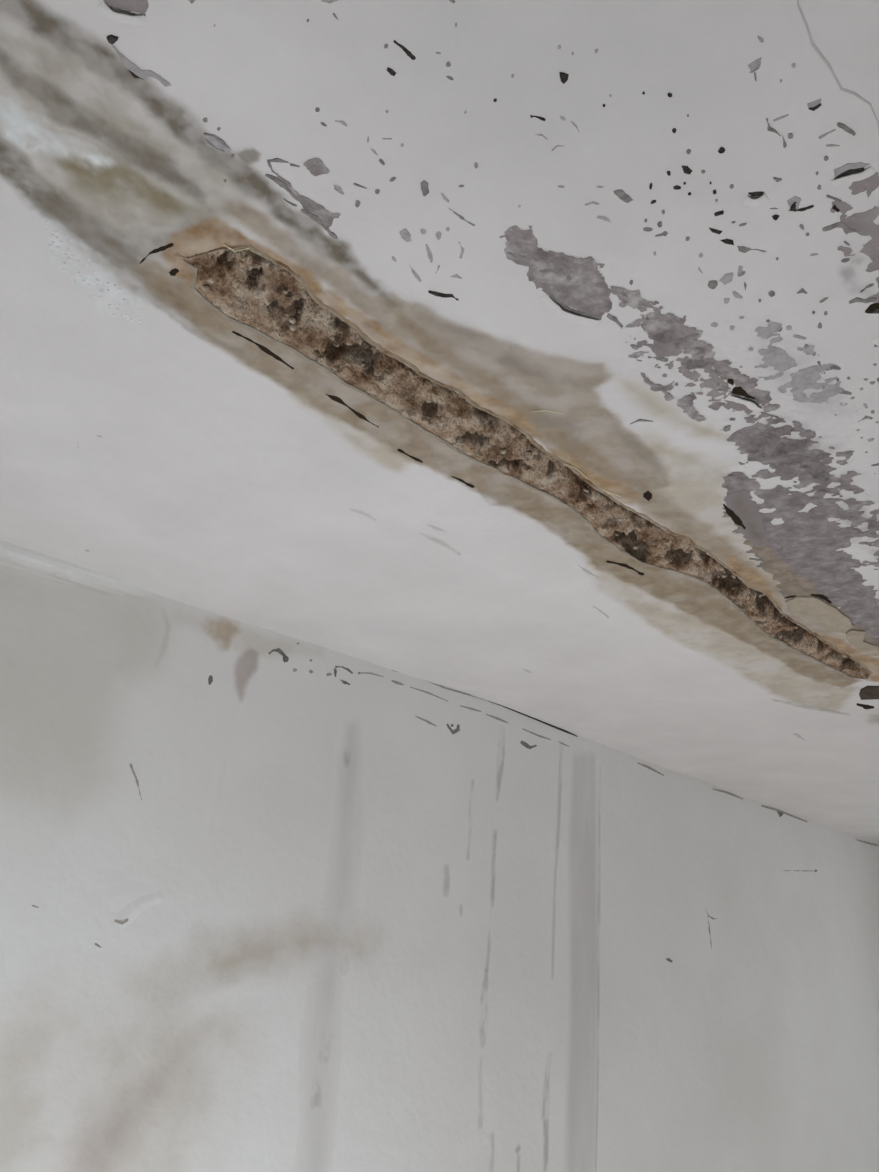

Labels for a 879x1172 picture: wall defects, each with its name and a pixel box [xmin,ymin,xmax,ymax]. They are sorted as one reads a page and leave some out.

peeling [96,0,171,87]
spalling [384,40,416,60]
crack [797,0,879,130]
peeling [203,118,396,239]
spalling [421,180,475,226]
spalling [597,186,633,203]
peeling [742,193,814,236]
peeling [816,122,879,321]
damp [0,0,879,728]
spalling [140,225,879,709]
crack [638,763,664,776]
crack [713,788,808,822]